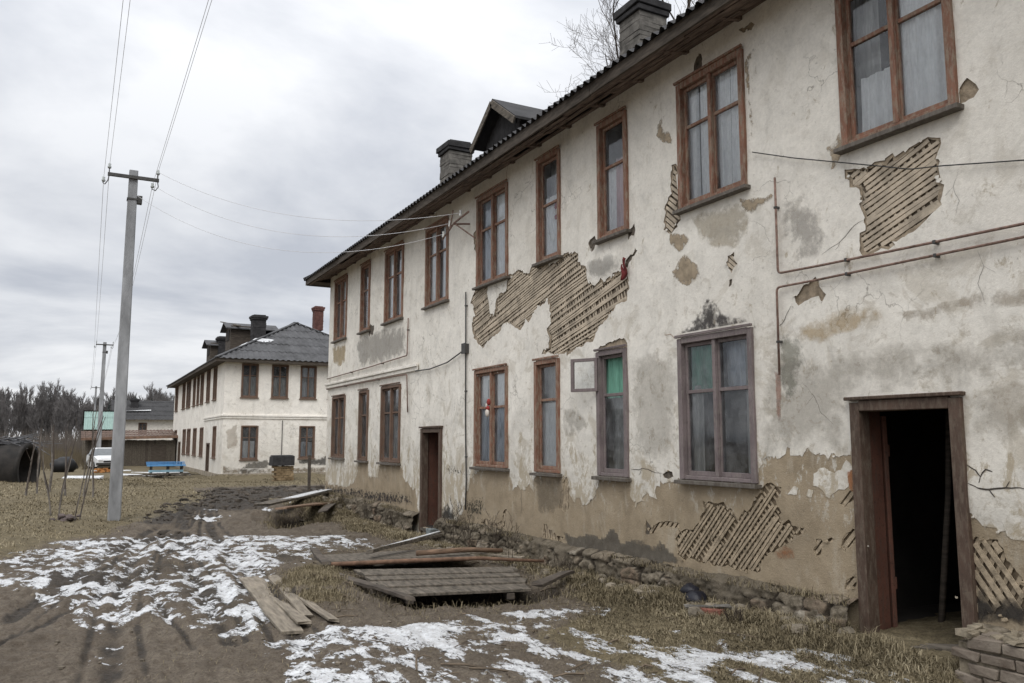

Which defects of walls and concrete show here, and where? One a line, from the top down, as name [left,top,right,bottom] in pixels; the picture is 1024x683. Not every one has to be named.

peeling [657,120,672,143]
flaking render [960,79,979,103]
flaking render [664,164,699,286]
peeling [740,194,772,211]
flaking render [827,135,944,255]
flaking render [471,250,637,355]
flaking render [792,278,826,305]
crack [967,465,1024,497]
peeling [459,447,869,632]
flaking render [970,513,1024,631]